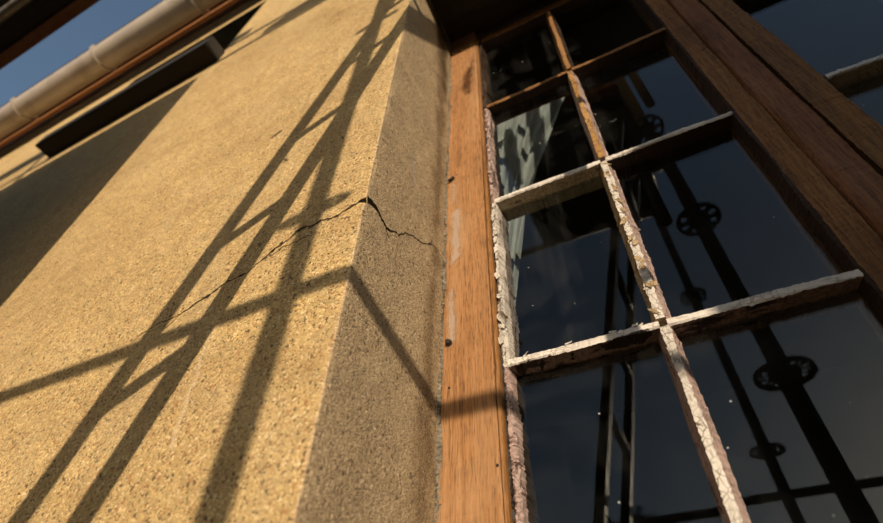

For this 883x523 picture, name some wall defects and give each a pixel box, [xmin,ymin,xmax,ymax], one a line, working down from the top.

crack [134,197,438,340]